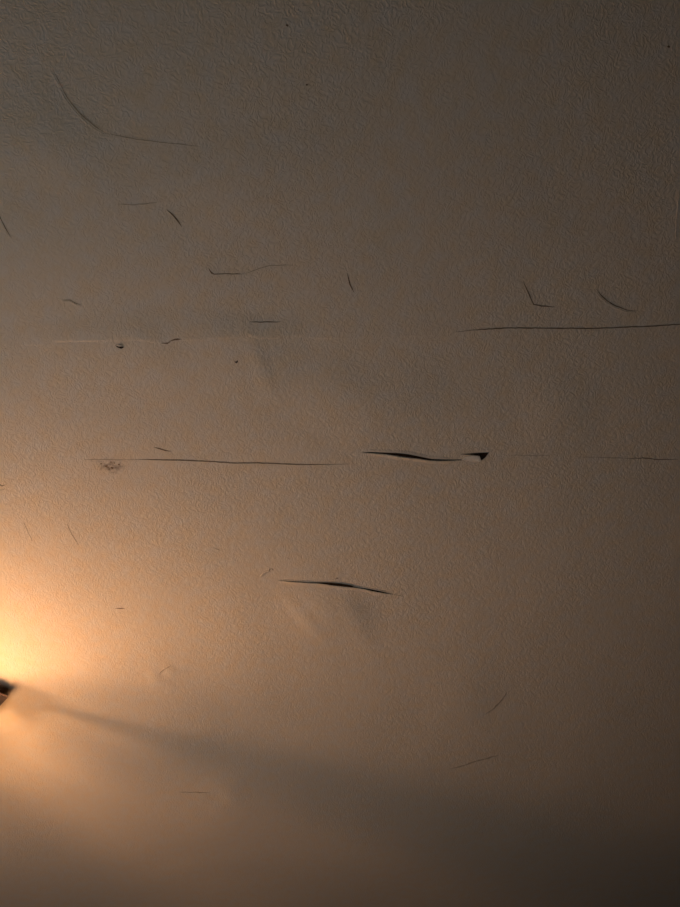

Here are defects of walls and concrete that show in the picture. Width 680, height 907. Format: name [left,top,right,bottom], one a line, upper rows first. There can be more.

crack [84,447,350,466]